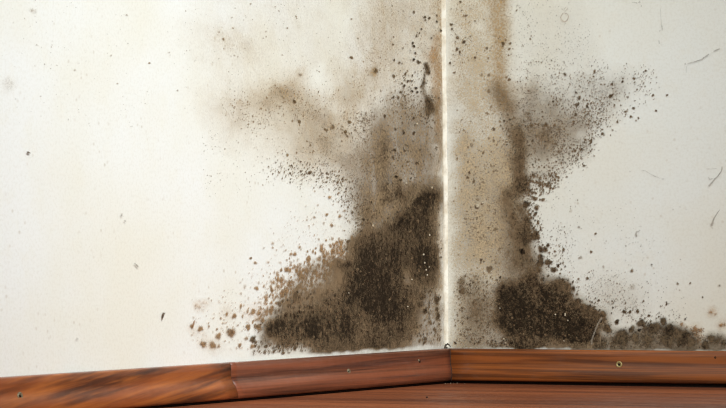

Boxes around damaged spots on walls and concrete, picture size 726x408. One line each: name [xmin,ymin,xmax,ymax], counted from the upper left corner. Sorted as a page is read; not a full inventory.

damp [241,0,726,354]